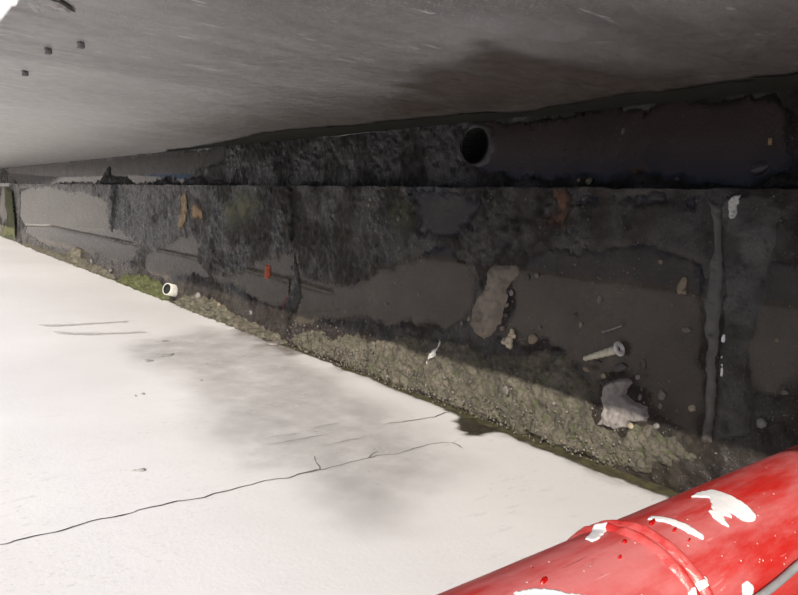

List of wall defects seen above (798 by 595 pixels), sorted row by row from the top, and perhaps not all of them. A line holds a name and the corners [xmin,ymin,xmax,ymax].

crack [0,412,462,545]
damp [455,412,499,435]